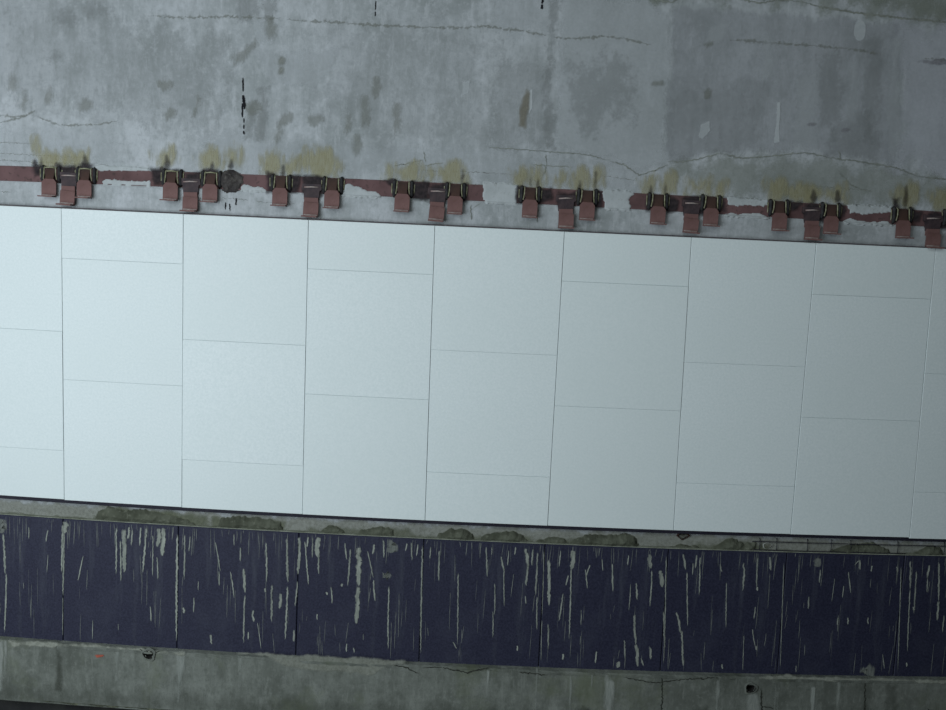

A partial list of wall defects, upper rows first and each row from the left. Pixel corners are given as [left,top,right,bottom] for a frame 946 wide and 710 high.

crack [744,0,946,23]
leakage [32,139,89,167]
leakage [387,160,466,183]
crack [489,147,945,192]
leakage [769,178,844,203]